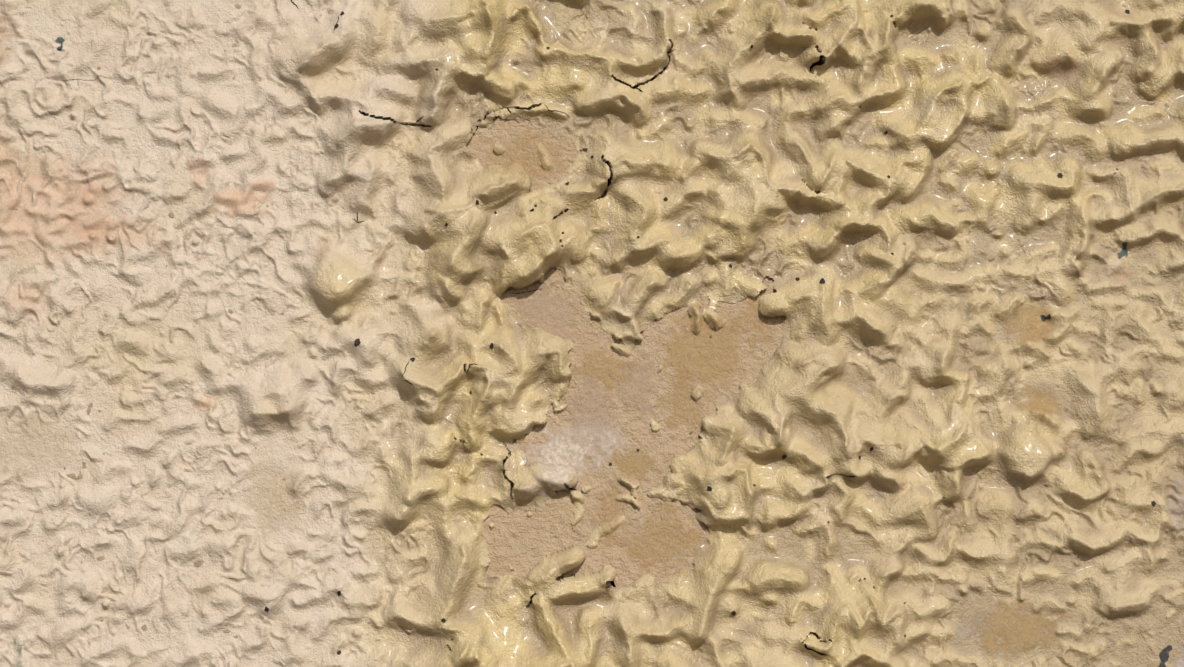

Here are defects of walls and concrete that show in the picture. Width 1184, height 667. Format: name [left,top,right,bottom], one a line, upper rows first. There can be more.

crack [630,52,670,92]
crack [475,106,570,132]
peeling [466,110,587,197]
peeling [471,267,785,592]
peeling [1088,592,1184,667]